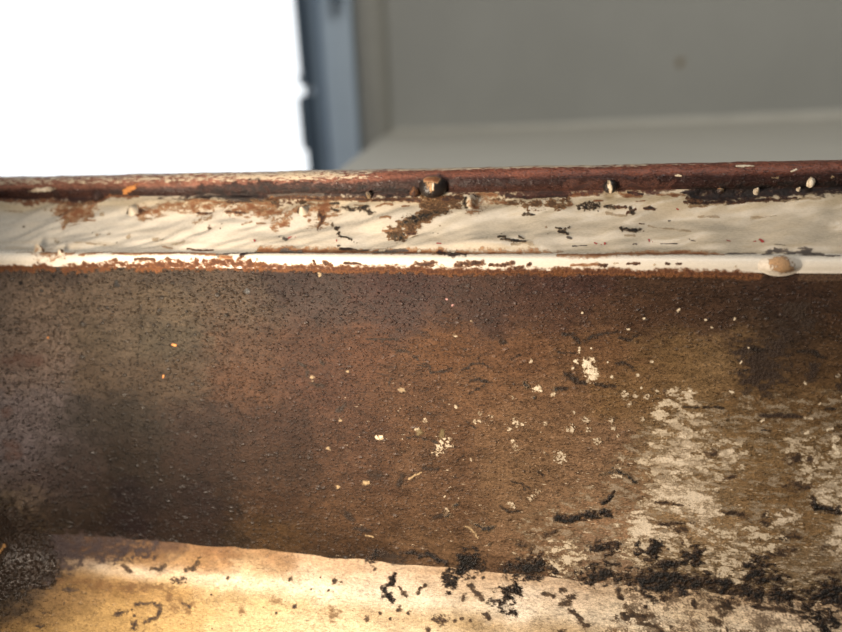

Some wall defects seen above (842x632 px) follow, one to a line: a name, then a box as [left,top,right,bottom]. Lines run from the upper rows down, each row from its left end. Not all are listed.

peeling [29,187,59,197]
rust [440,175,842,212]
peeling [561,200,656,215]
peeling [269,196,374,247]
peeling [382,195,462,242]
rust [0,245,763,280]
rust [798,273,842,281]
water stain [466,583,484,602]
water stain [637,620,673,632]